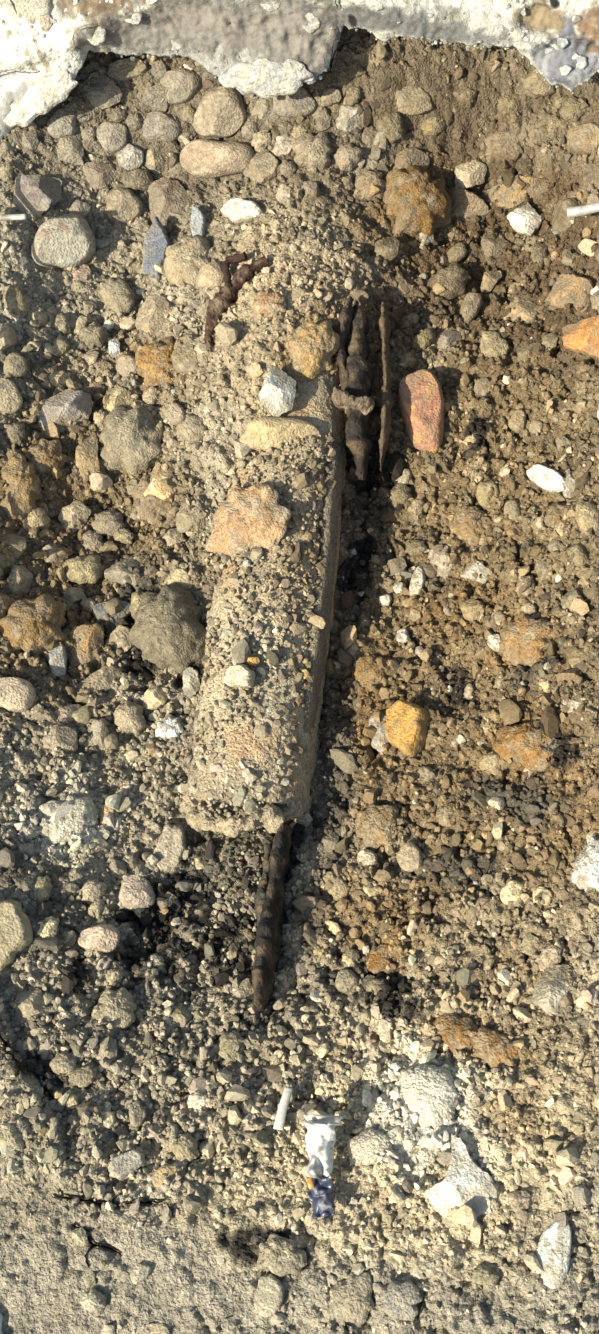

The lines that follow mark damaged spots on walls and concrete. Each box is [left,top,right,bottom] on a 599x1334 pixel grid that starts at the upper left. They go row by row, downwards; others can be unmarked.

corrosion [577,7,599,52]
crack [0,1030,54,1107]